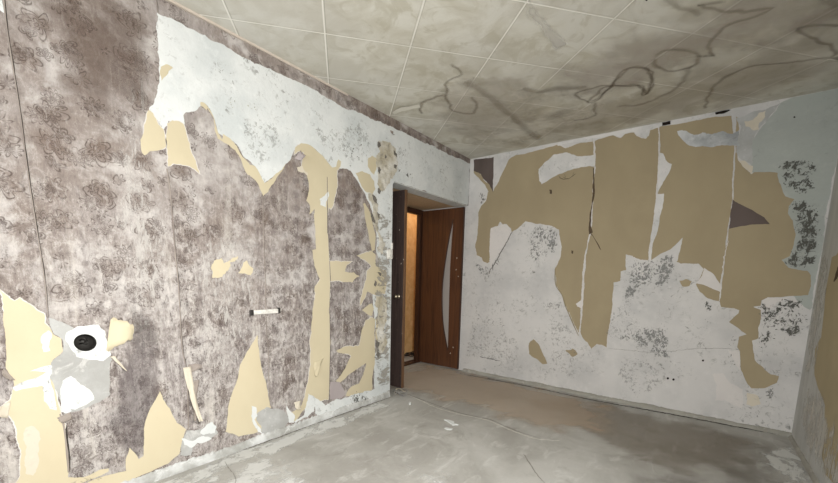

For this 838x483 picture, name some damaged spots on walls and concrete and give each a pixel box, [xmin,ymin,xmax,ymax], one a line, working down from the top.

flaking render [149,13,470,434]
flaking render [538,152,595,194]
damp [610,255,674,357]
flaking render [649,153,672,261]
flaking render [677,130,740,147]
damp [758,160,827,373]
peeling [13,318,112,414]
flaking render [23,426,41,476]